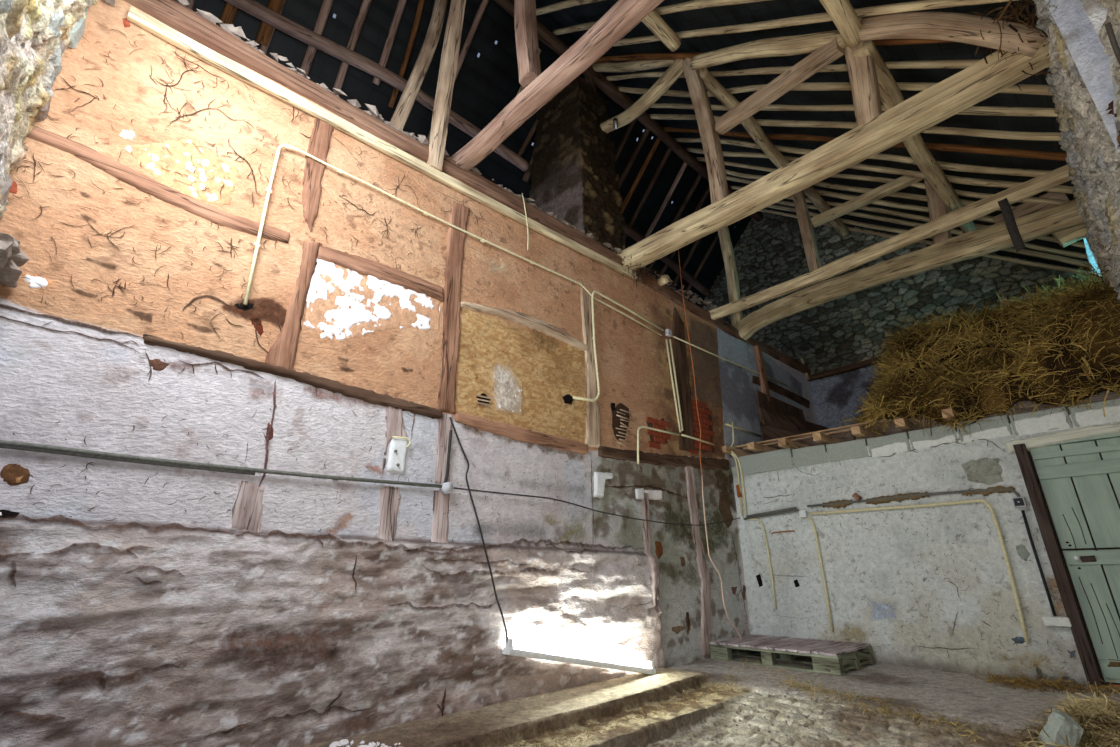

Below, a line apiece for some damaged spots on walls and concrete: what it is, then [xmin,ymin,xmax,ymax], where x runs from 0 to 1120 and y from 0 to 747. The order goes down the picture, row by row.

peeling [119,130,239,206]
peeling [304,259,440,343]
crack [0,304,152,381]
crack [180,295,317,487]
flaking render [646,416,671,449]
flaking render [688,399,716,454]
water stain [664,470,737,552]
crack [350,556,358,592]